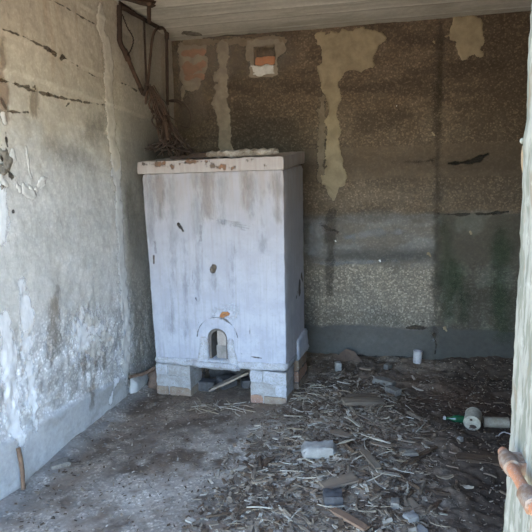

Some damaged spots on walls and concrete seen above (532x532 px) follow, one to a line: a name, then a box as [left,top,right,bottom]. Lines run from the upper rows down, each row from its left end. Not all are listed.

crack [3,29,66,61]
crack [0,78,105,107]
spalling [177,41,209,101]
flaking render [245,37,287,78]
flaking render [0,145,48,200]
crack [447,210,509,218]
leakage [0,278,39,447]
leakage [69,306,115,364]